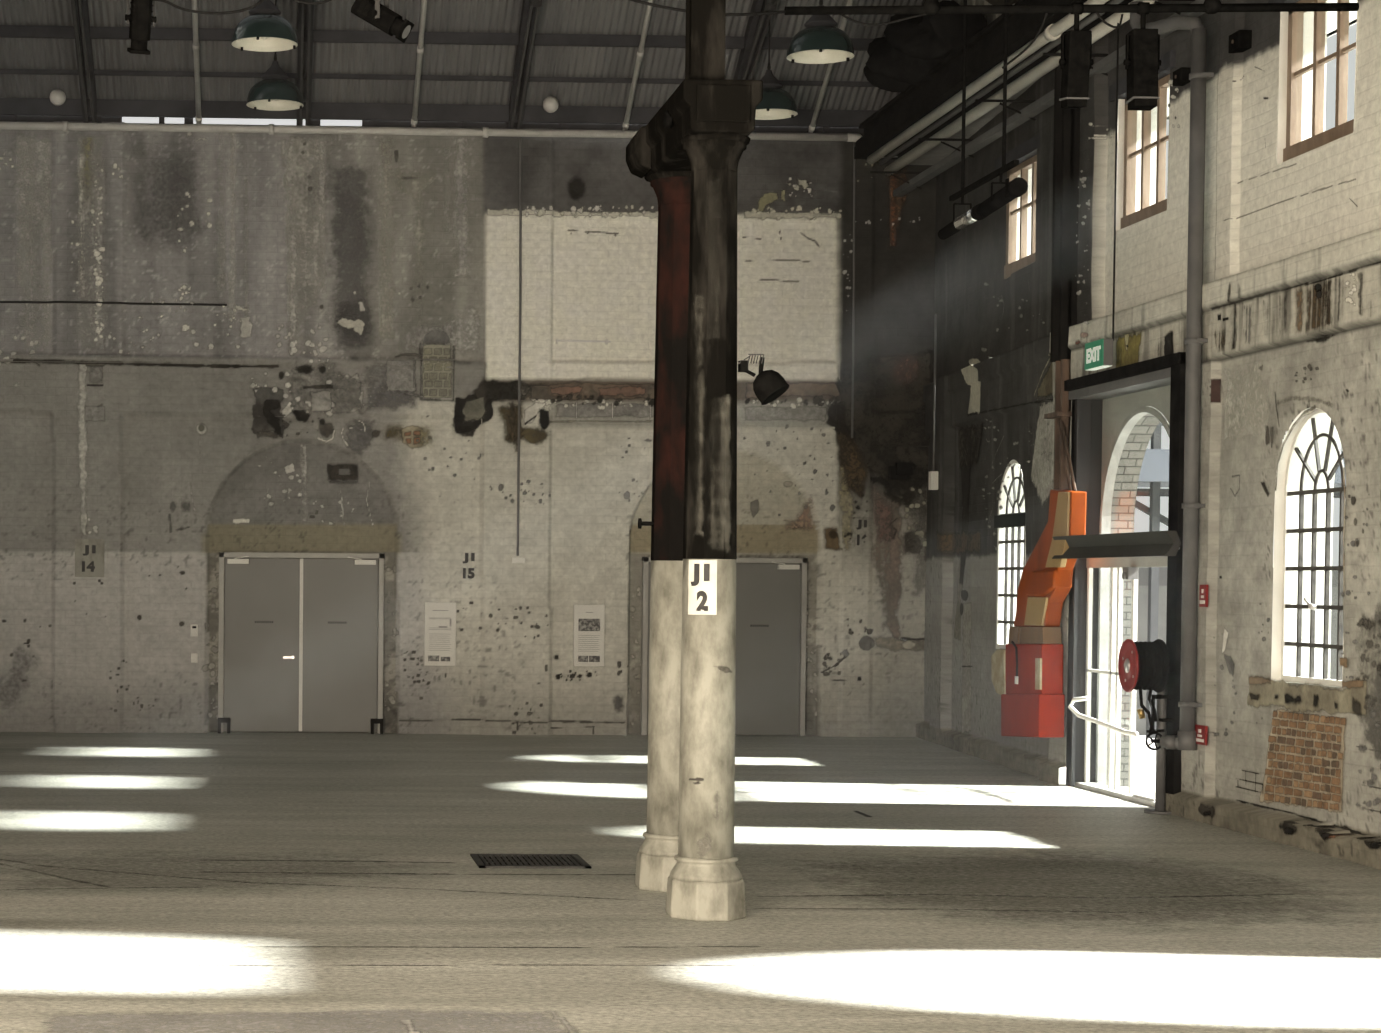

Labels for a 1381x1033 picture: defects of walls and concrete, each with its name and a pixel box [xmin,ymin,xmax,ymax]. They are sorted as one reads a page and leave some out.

peeling [338,291,365,335]
damp [281,136,479,353]
flaking render [250,324,373,525]
flaking render [385,330,493,477]
peeling [474,479,551,503]
damp [904,531,926,561]
flaking render [1256,709,1381,849]
damp [1356,608,1381,813]